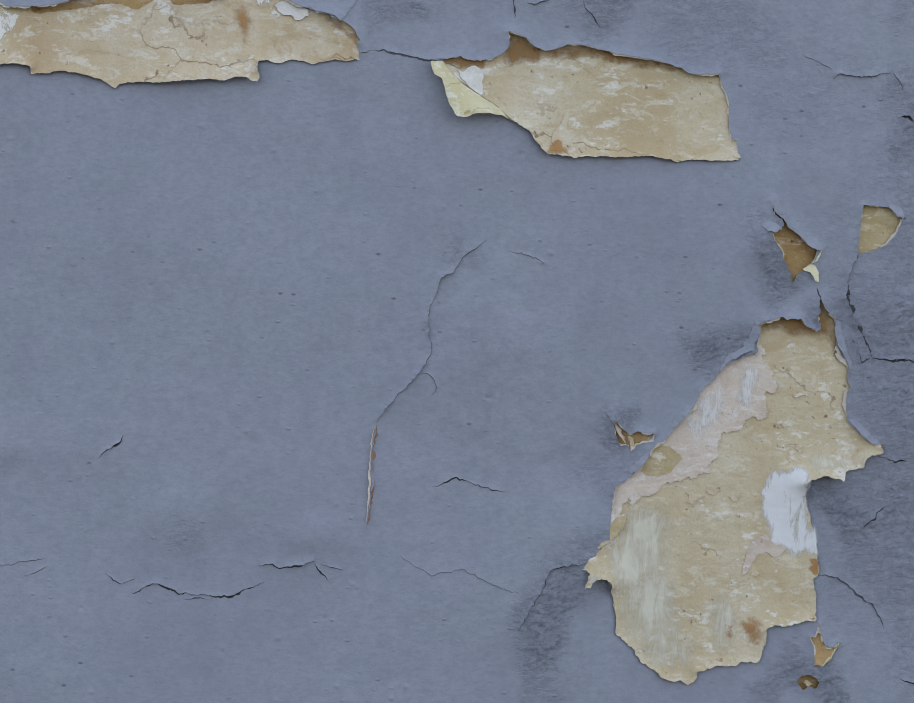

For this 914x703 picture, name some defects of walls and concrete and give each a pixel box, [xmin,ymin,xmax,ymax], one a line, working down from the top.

peeling [0,0,372,88]
peeling [426,16,751,162]
crack [583,0,606,28]
crack [802,45,914,122]
peeling [844,191,912,264]
crack [813,250,914,370]
crack [359,234,548,529]
peeling [576,192,895,703]
crack [0,548,47,576]
crack [105,550,344,599]
crack [507,549,590,632]
crack [818,566,892,629]